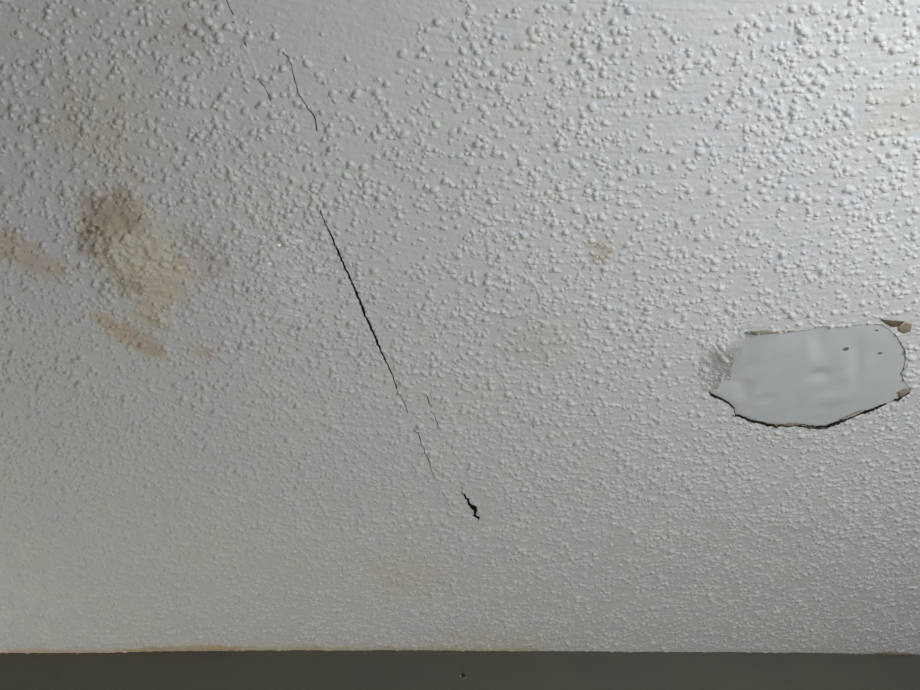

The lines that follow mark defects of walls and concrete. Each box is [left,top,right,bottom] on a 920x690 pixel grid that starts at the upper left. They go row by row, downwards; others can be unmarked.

crack [283,52,318,131]
water stain [0,0,245,364]
crack [320,210,441,473]
peeling [700,319,912,430]
crack [461,488,480,520]